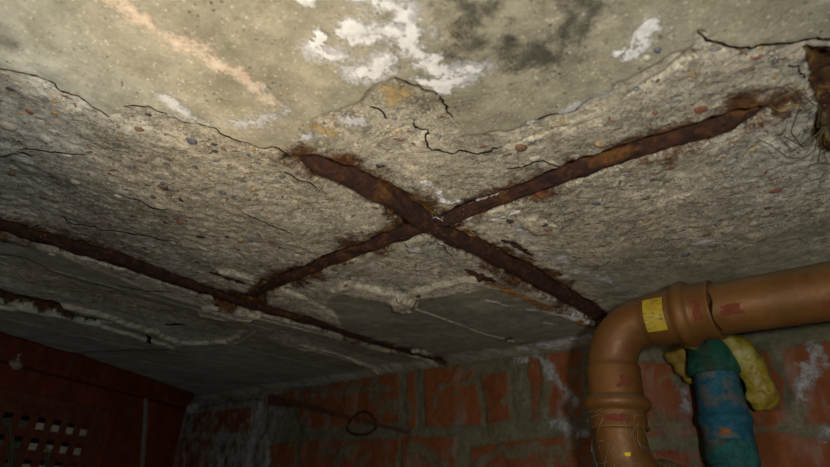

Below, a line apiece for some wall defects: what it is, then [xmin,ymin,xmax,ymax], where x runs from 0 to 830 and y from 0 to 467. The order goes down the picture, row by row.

crack [0,68,316,188]
spalling [0,29,830,361]
crack [395,77,453,118]
leakage [298,0,602,106]
crack [413,120,501,155]
crack [506,160,560,170]
rust [271,44,830,218]
efflorescence [612,17,666,62]
crack [697,31,830,55]
rust [0,291,100,322]
rust [139,205,410,316]
rust [452,211,608,330]